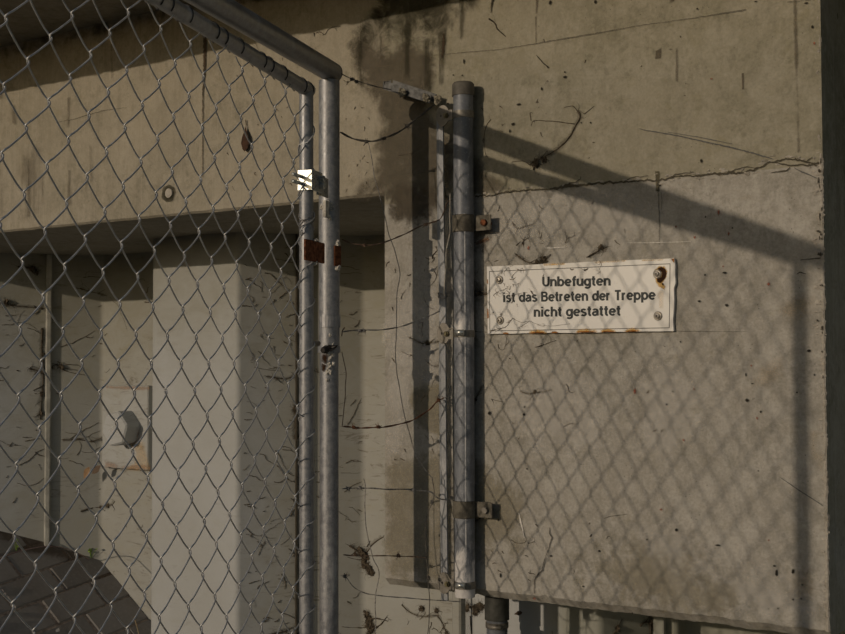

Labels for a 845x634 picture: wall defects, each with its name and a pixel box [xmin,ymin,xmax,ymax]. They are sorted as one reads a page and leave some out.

damp [355,0,453,219]
crack [475,129,819,239]